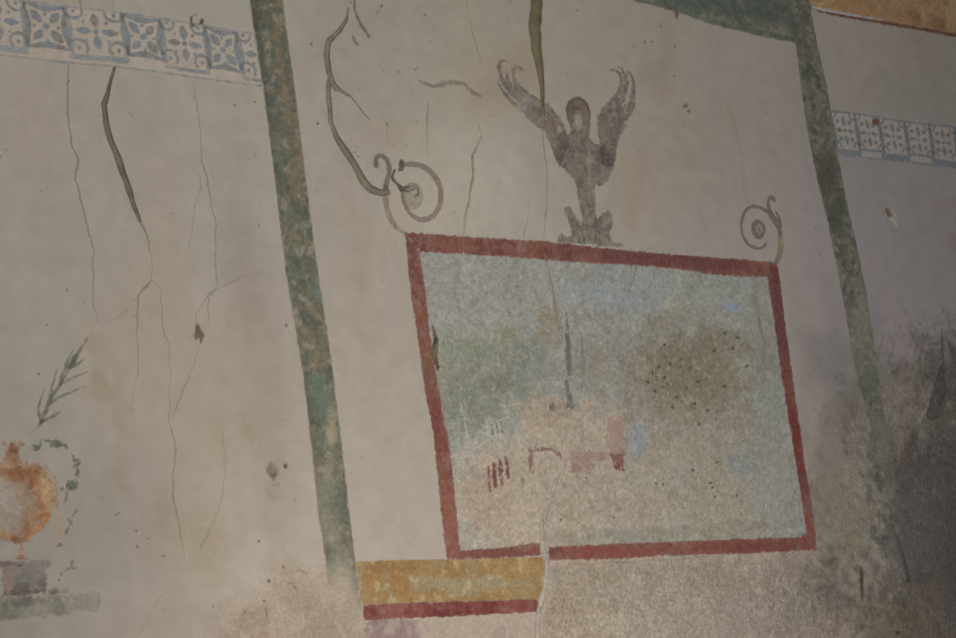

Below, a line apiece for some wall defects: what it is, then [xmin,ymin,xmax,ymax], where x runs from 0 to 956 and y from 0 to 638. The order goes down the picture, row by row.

crack [67,79,94,267]
crack [101,67,149,242]
crack [324,0,391,196]
crack [417,79,482,97]
crack [464,142,479,219]
crack [529,0,547,218]
crack [536,463,564,638]